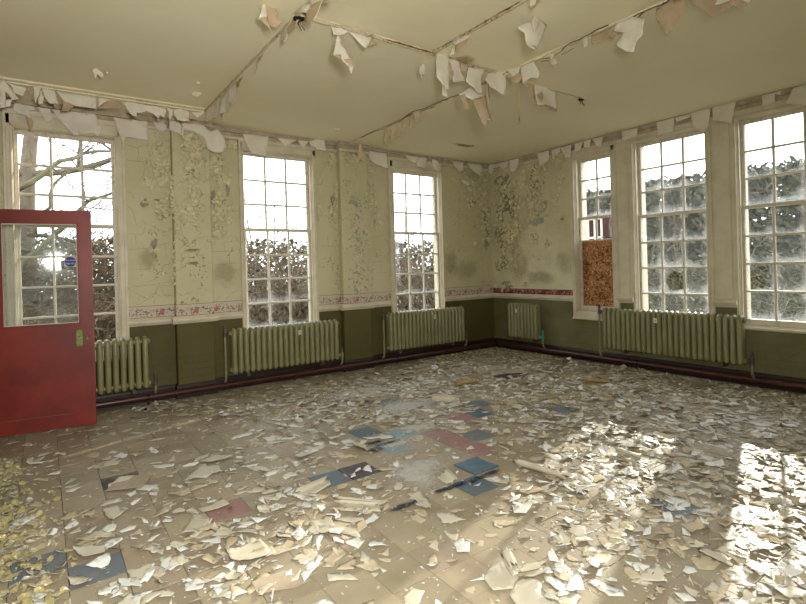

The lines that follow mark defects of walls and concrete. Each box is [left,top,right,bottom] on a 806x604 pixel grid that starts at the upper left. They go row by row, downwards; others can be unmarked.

peeling [258,0,323,45]
peeling [331,27,378,75]
peeling [517,0,547,50]
peeling [613,17,645,52]
peeling [436,34,557,125]
peeling [0,76,227,153]
peeling [657,102,736,135]
peeling [243,134,326,156]
peeling [358,144,389,168]
peeling [537,137,603,166]
peeling [452,158,527,292]